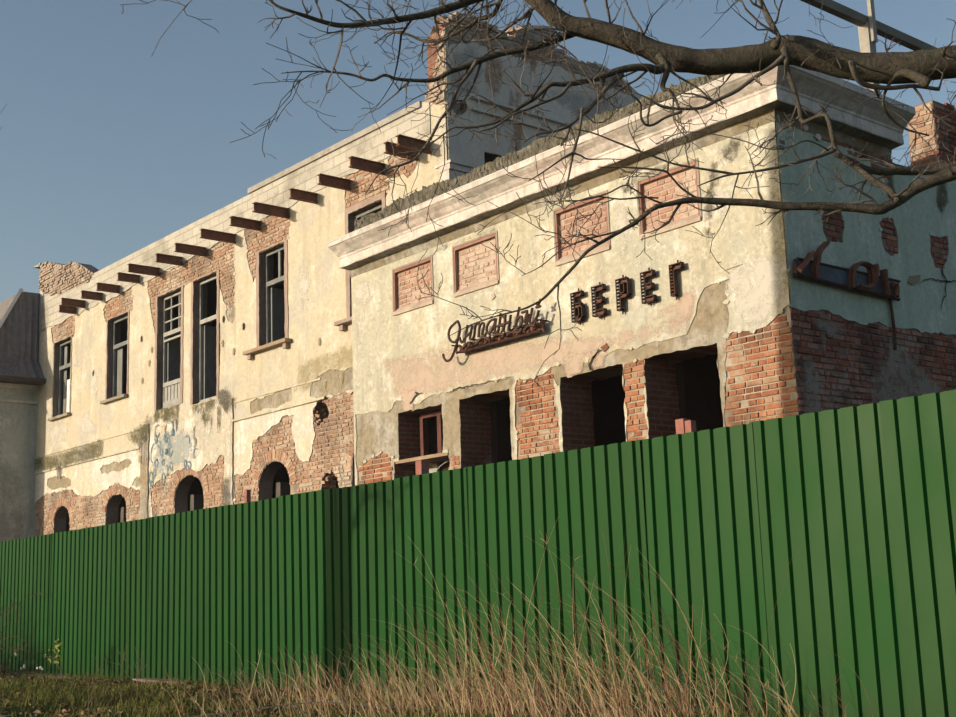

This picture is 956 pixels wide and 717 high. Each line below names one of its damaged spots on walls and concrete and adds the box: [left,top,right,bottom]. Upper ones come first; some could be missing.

flaking render [424,14,632,105]
flaking render [821,201,846,243]
flaking render [879,216,898,256]
flaking render [34,257,799,537]